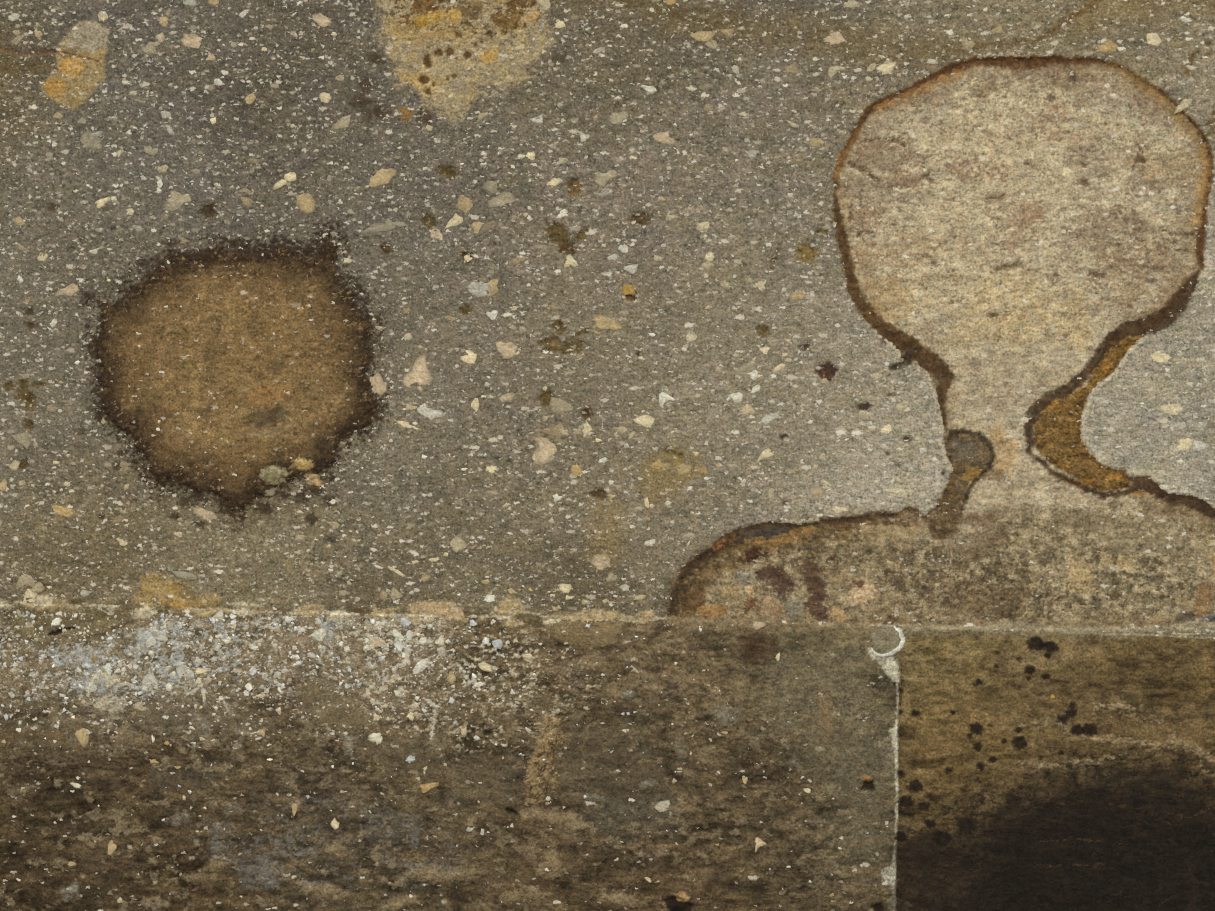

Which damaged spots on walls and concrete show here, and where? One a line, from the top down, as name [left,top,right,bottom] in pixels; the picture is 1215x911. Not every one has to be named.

spalling [432,160,462,183]
spalling [458,249,477,268]
spalling [495,30,1215,773]
leakage [1171,582,1215,725]
peeling [521,709,567,807]